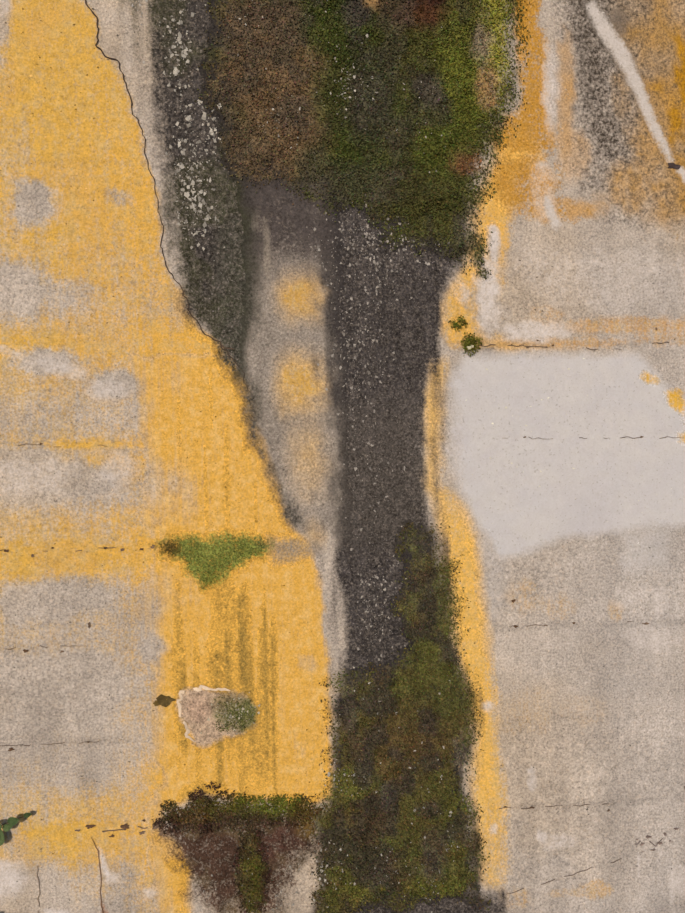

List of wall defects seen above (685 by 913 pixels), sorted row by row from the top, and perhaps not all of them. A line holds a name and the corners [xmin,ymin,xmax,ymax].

crack [85,0,249,391]
water stain [262,215,272,306]
peeling [0,0,334,913]
water stain [221,370,326,570]
water stain [171,569,279,805]